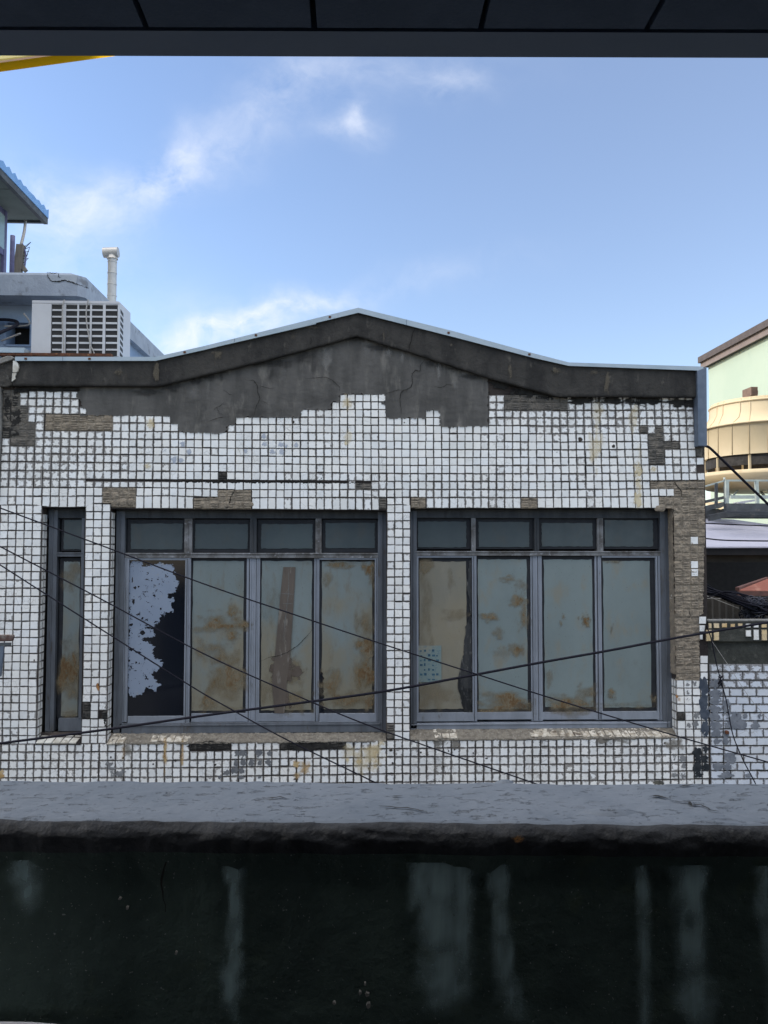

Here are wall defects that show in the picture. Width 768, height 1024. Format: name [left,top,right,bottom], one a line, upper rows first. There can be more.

peeling [0,356,113,447]
peeling [639,426,680,465]
water stain [416,863,470,1002]
water stain [490,865,515,1004]